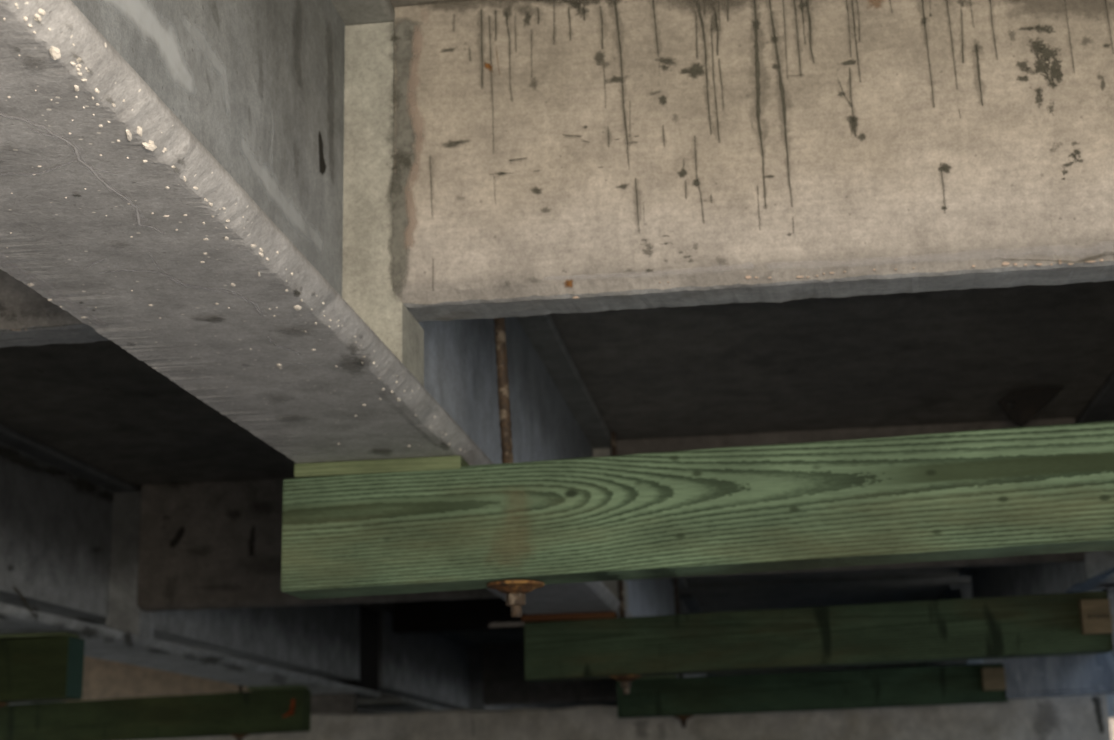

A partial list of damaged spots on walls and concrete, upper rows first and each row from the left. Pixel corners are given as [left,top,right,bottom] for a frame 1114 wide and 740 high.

crack [0,114,164,234]
damp [389,20,422,293]
damp [433,0,629,164]
damp [653,0,814,223]
damp [838,0,865,140]
damp [922,0,934,106]
damp [946,0,983,106]
damp [1016,4,1075,114]
damp [1062,142,1083,180]